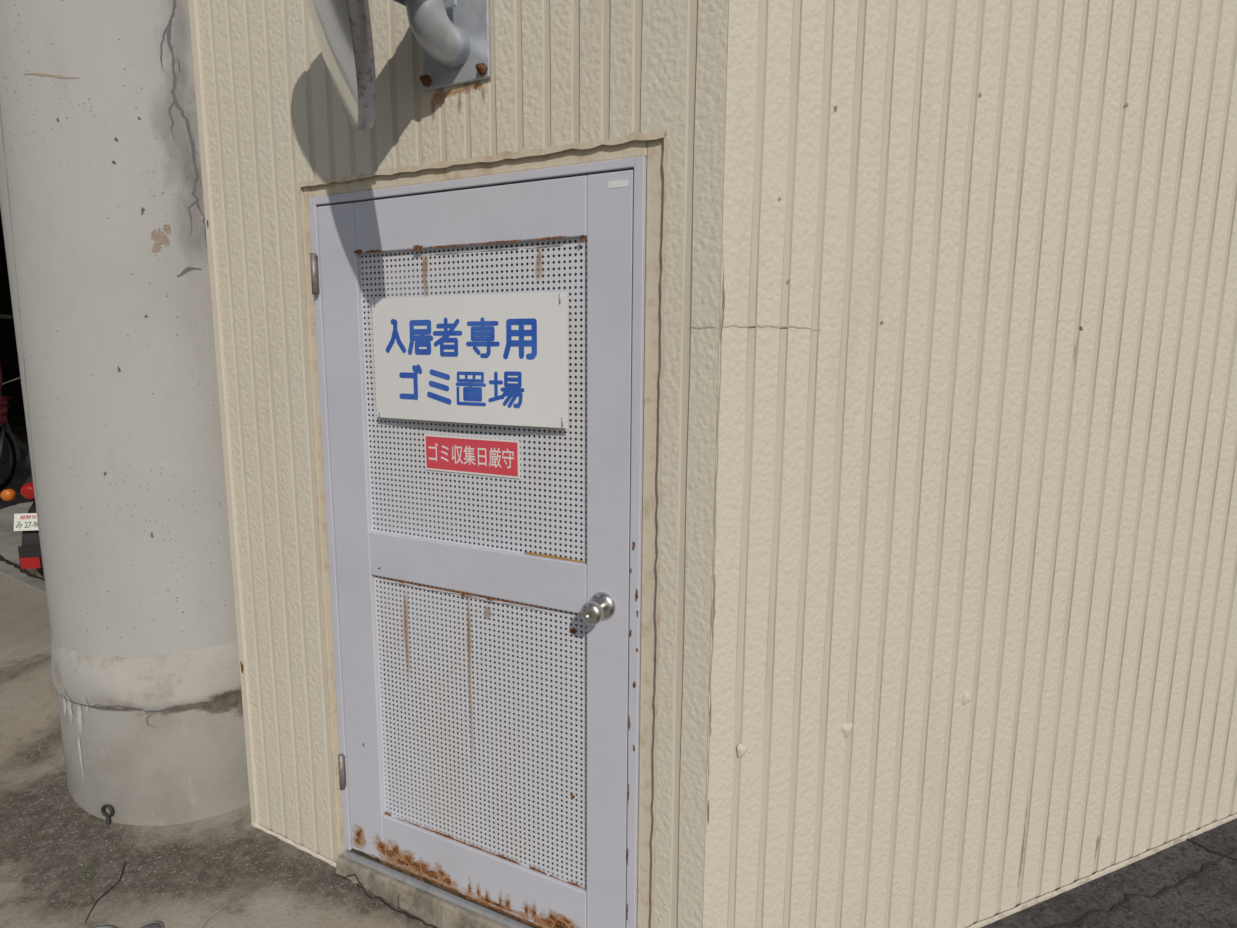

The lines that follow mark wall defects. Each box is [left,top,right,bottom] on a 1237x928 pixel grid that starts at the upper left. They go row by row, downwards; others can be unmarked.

crack [160,0,207,247]
spalling [151,224,171,252]
rust [413,235,585,288]
leakage [62,694,136,778]
crack [47,683,169,728]
leakage [161,690,243,713]
rust [355,828,573,928]
rust [384,812,585,889]